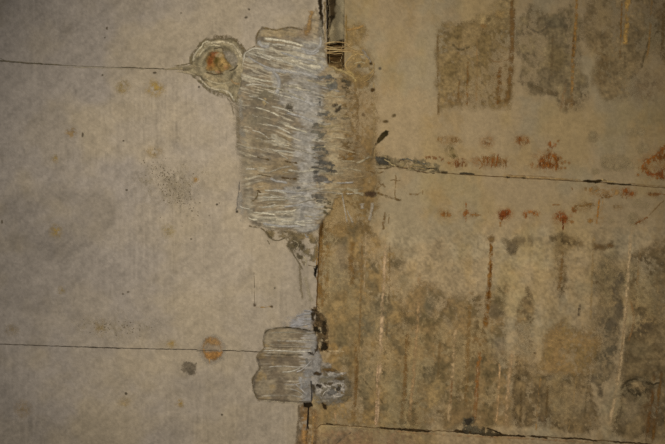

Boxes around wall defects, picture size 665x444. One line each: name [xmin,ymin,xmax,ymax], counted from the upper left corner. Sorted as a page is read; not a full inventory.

crack [317,0,325,35]
peeling [317,75,352,100]
peeling [311,104,344,184]
corrosion [530,140,570,170]
corrosion [637,145,665,179]
crack [438,171,665,188]
water stain [266,0,665,444]
corrosion [552,187,634,230]
crack [4,344,262,353]
corrosion [200,337,224,363]
peeling [308,307,352,409]
crack [316,417,650,444]